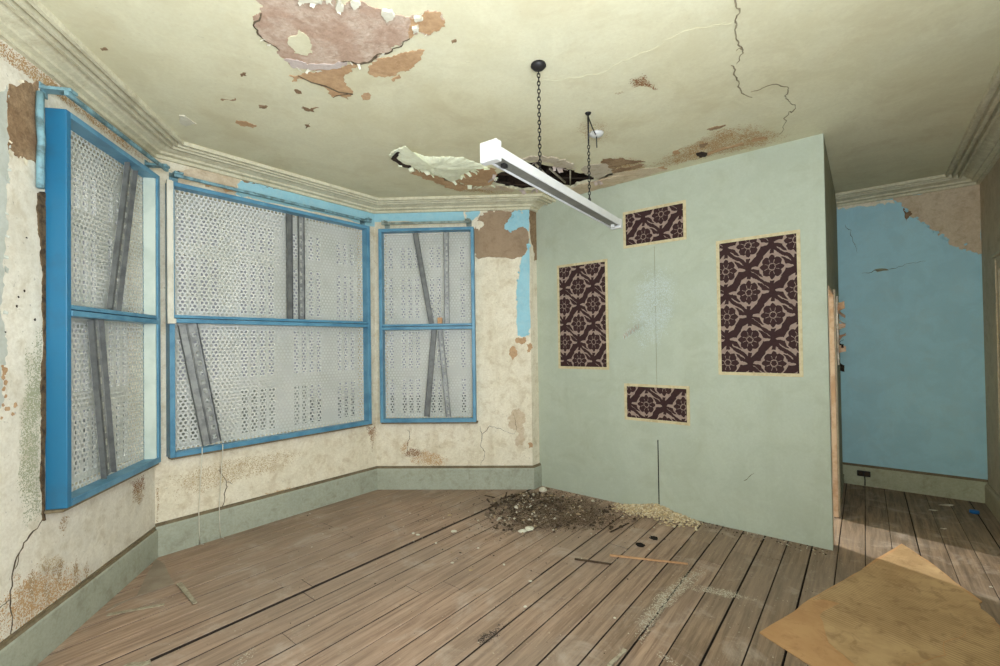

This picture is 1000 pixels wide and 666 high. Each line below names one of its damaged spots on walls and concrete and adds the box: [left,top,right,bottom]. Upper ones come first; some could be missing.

spalling [252,0,445,100]
crack [705,0,796,134]
spalling [0,79,40,420]
spalling [177,168,537,360]
spalling [550,158,669,185]
water stain [612,124,790,173]
peeling [837,184,982,255]
crack [0,519,43,635]